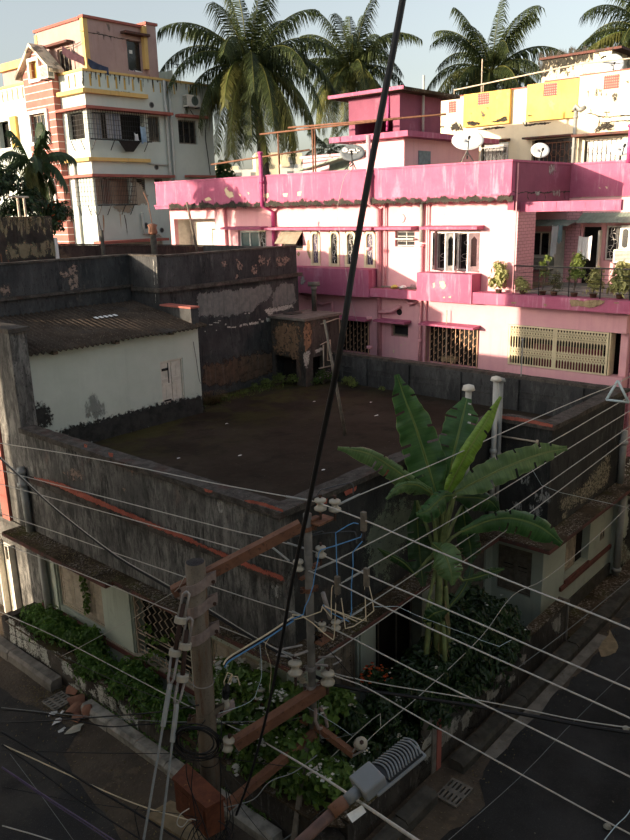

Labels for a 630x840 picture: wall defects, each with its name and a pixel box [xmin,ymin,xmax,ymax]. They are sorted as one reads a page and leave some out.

crack [584,109,630,131]
water stain [0,216,55,260]
peeling [60,264,79,290]
peeling [221,240,310,280]
peeling [205,304,293,332]
water stain [35,320,312,443]
peeling [9,618,139,730]